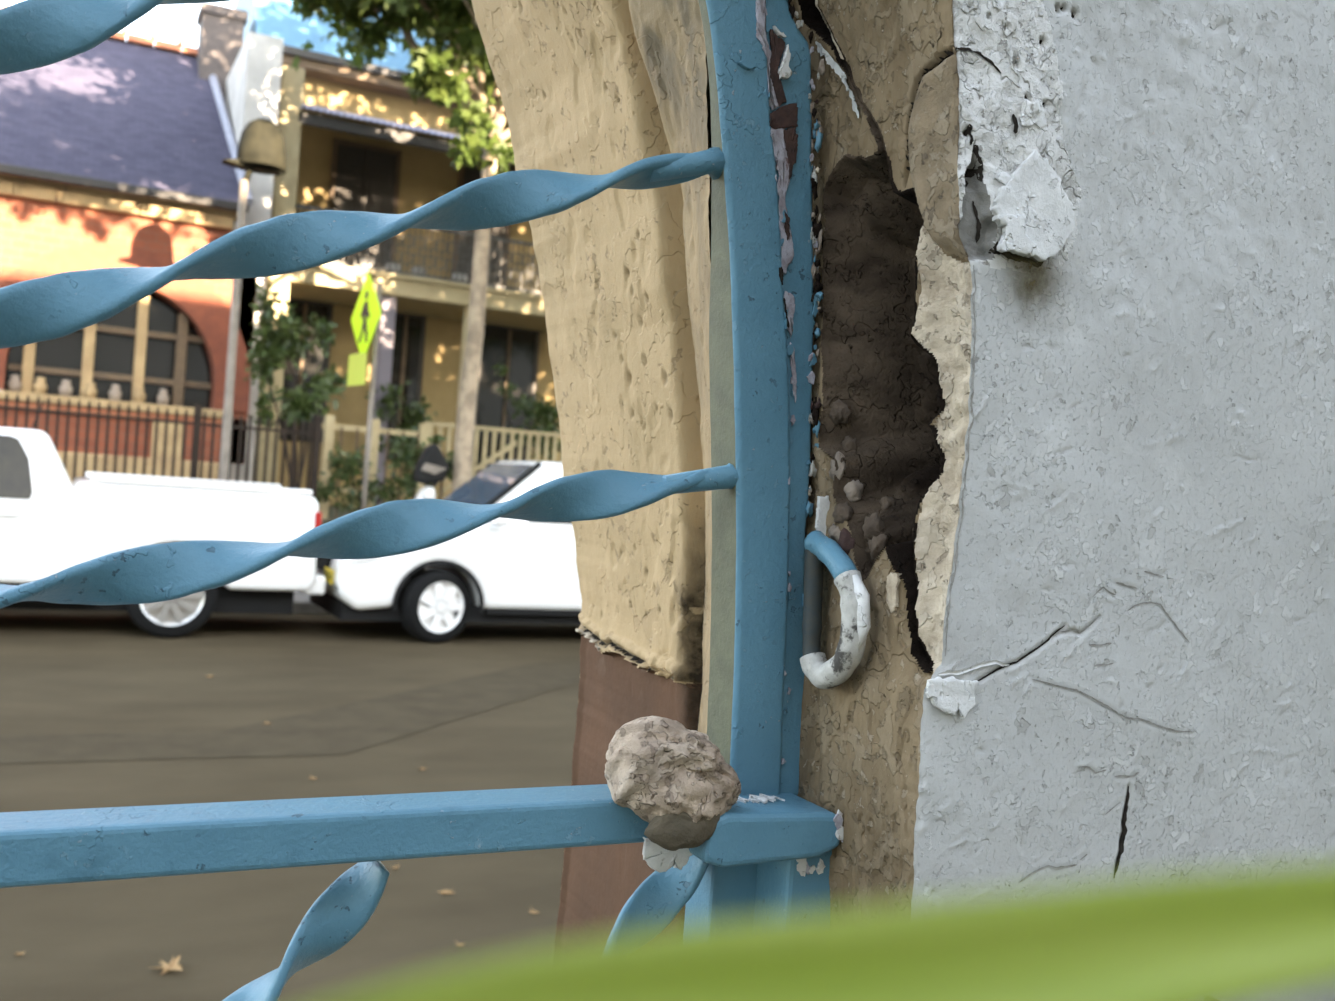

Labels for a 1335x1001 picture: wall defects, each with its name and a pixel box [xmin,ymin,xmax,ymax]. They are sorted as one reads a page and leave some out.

spalling [737,0,1081,673]
crack [925,571,1191,732]
crack [1019,766,1139,883]